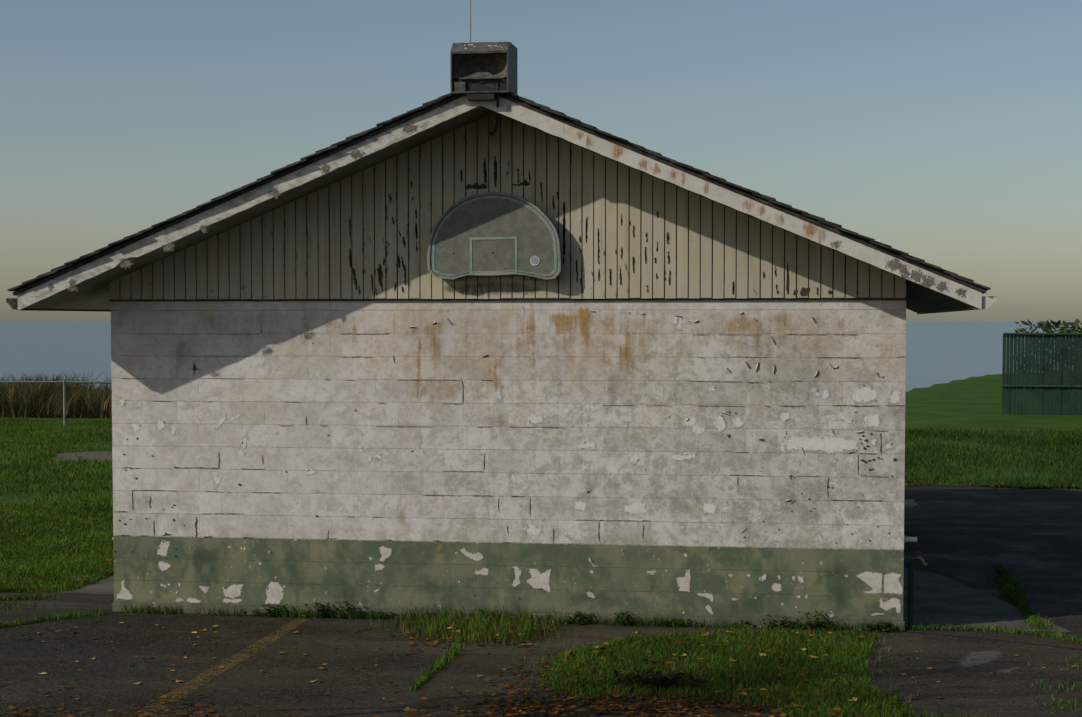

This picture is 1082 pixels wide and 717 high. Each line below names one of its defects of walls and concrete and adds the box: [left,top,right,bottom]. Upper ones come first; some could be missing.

peeling [349,181,418,295]
corrosion [555,309,590,328]
peeling [157,533,177,571]
peeling [369,546,392,571]
peeling [460,543,488,576]
peeling [116,580,133,600]
peeling [160,583,243,603]
peeling [265,576,286,604]
peeling [512,566,551,599]
peeling [647,554,714,615]
peeling [746,573,808,608]
peeling [844,571,903,616]